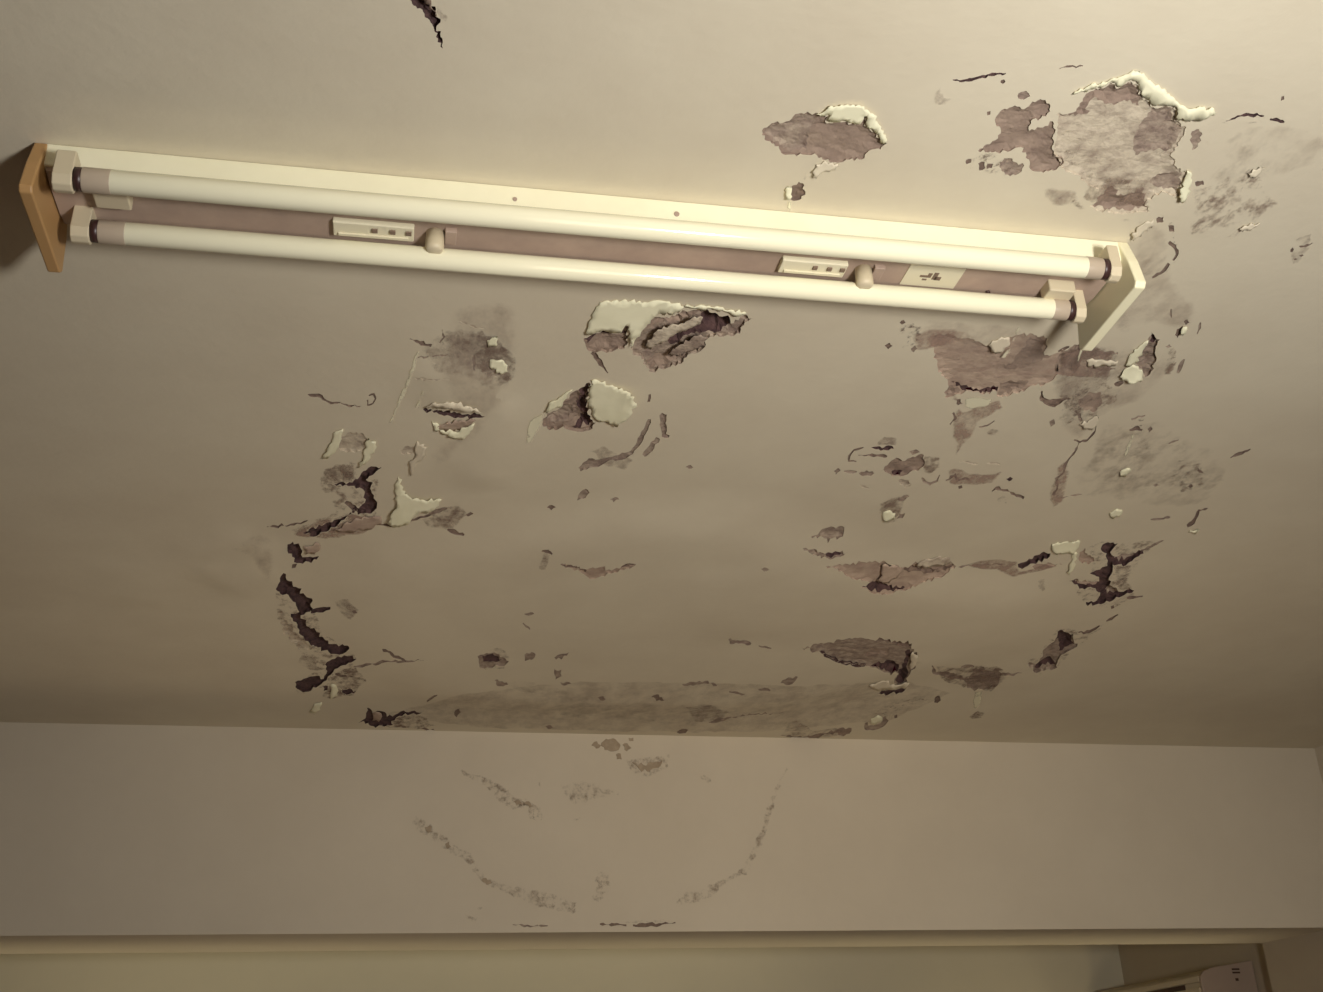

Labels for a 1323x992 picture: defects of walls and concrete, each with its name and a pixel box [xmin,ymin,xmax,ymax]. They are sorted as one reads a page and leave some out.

crack [411,0,443,48]
peeling [762,105,887,209]
peeling [966,70,1216,214]
peeling [390,321,509,422]
spalling [527,299,752,442]
peeling [900,309,1201,431]
peeling [322,429,376,481]
crack [267,466,473,731]
spalling [803,526,956,595]
crack [959,508,1207,609]
spalling [803,614,1118,730]